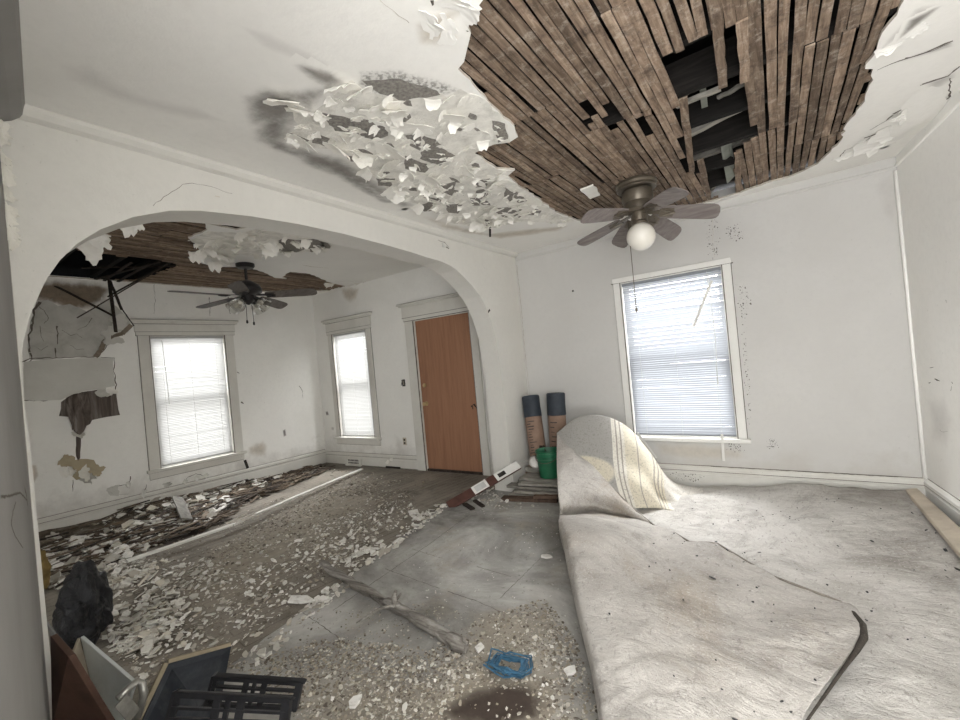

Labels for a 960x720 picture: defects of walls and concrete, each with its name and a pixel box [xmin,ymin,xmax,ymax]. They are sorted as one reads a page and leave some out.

damp [48,20,575,241]
flaking render [263,0,901,237]
flaking render [0,119,343,720]